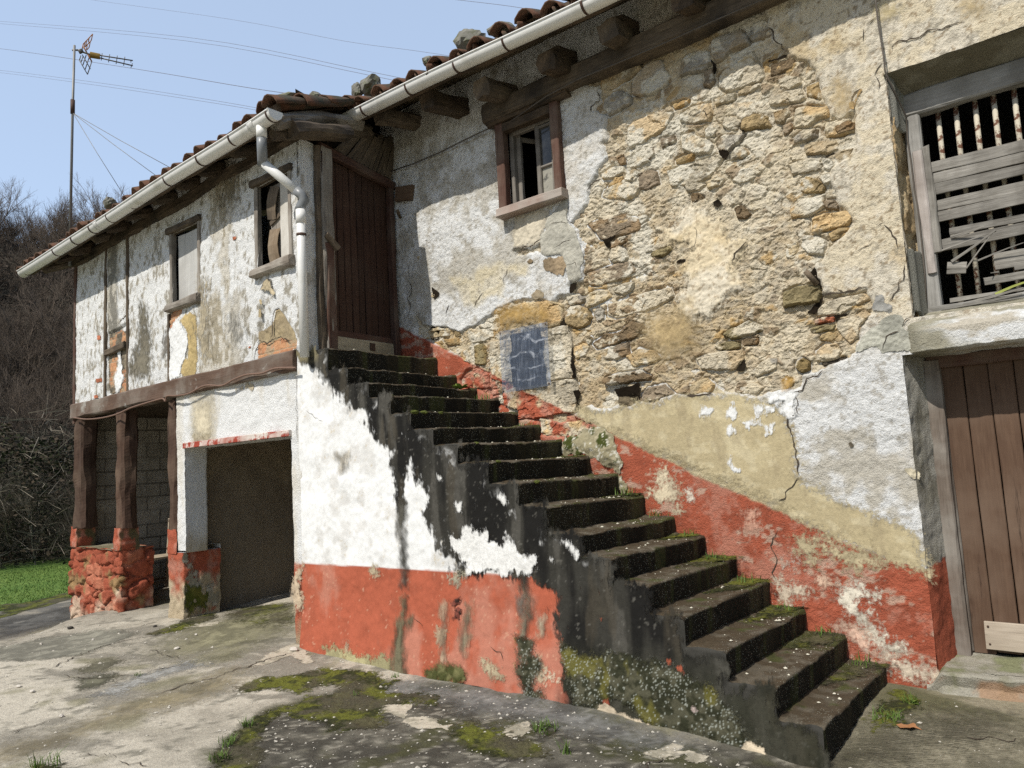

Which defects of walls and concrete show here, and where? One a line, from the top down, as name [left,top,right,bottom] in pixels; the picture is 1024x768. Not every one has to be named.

crack [851,22,961,114]
flaking render [94,330,126,399]
flaking render [170,310,198,376]
flaking render [248,279,297,359]
spalling [803,268,824,314]
flaking render [560,317,939,685]
peeling [182,553,221,610]
water stain [390,502,413,674]
water stain [516,571,545,638]
crack [770,532,779,580]